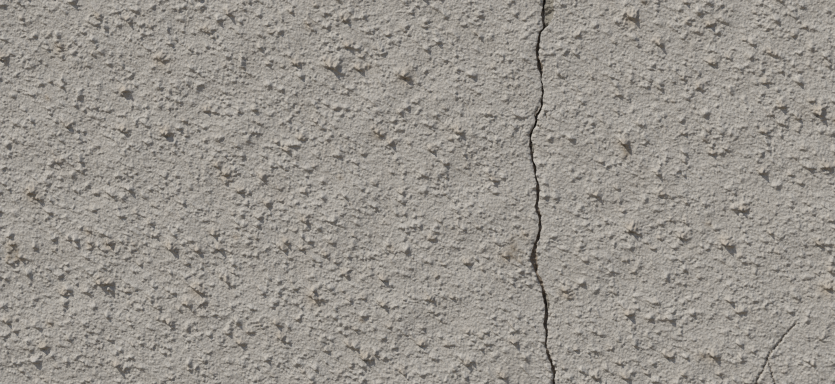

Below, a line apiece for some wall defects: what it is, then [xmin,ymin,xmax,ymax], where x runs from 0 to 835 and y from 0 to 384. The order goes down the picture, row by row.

crack [529,0,556,384]